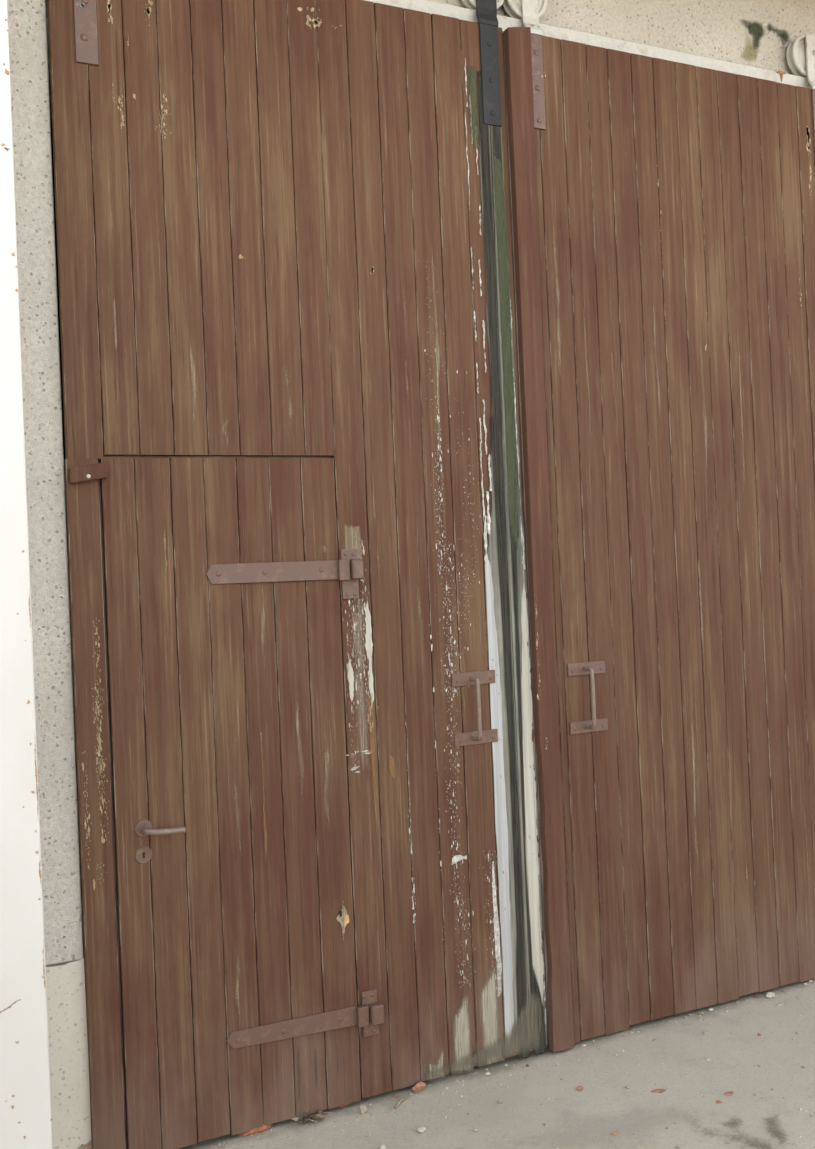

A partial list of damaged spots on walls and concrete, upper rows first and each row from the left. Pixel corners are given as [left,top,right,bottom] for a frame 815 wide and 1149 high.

peeling [465,60,482,235]
peeling [82,619,109,889]
peeling [345,528,374,773]
peeling [429,311,549,1079]